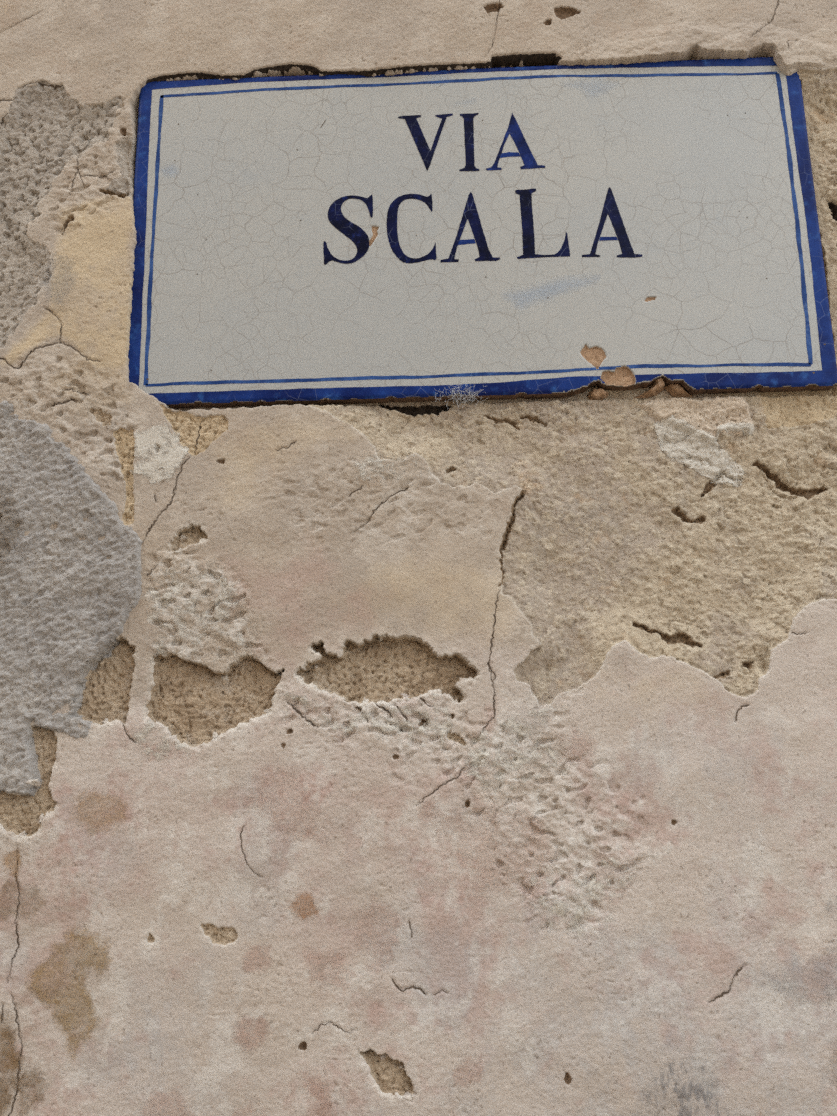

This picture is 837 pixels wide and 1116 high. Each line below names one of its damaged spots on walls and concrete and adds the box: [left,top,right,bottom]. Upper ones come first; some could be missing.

peeling [0,81,137,348]
flaking render [89,409,135,525]
crack [752,461,828,500]
flaking render [77,638,135,725]
flaking render [146,633,478,747]
crack [421,490,526,803]
crack [632,622,702,648]
crack [713,662,754,679]
flaking render [0,726,57,838]
crack [1,850,22,1116]
flaking render [360,1049,414,1101]